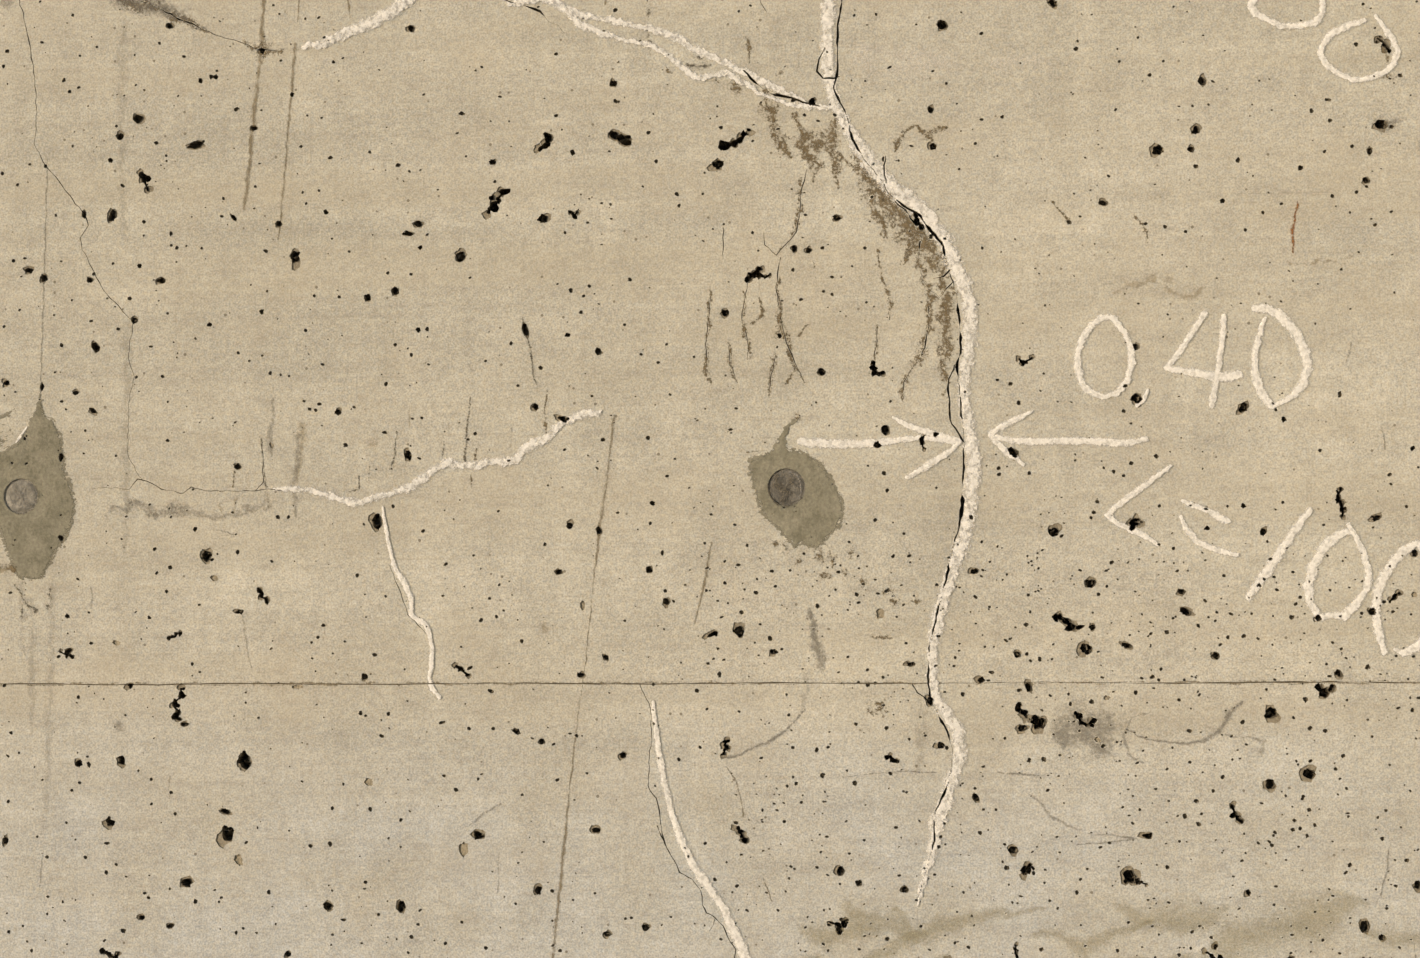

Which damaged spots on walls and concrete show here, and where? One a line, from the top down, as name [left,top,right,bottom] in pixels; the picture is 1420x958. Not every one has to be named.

crack [505,0,561,29]
crack [705,169,807,390]
crack [744,0,965,900]
crack [640,686,736,958]